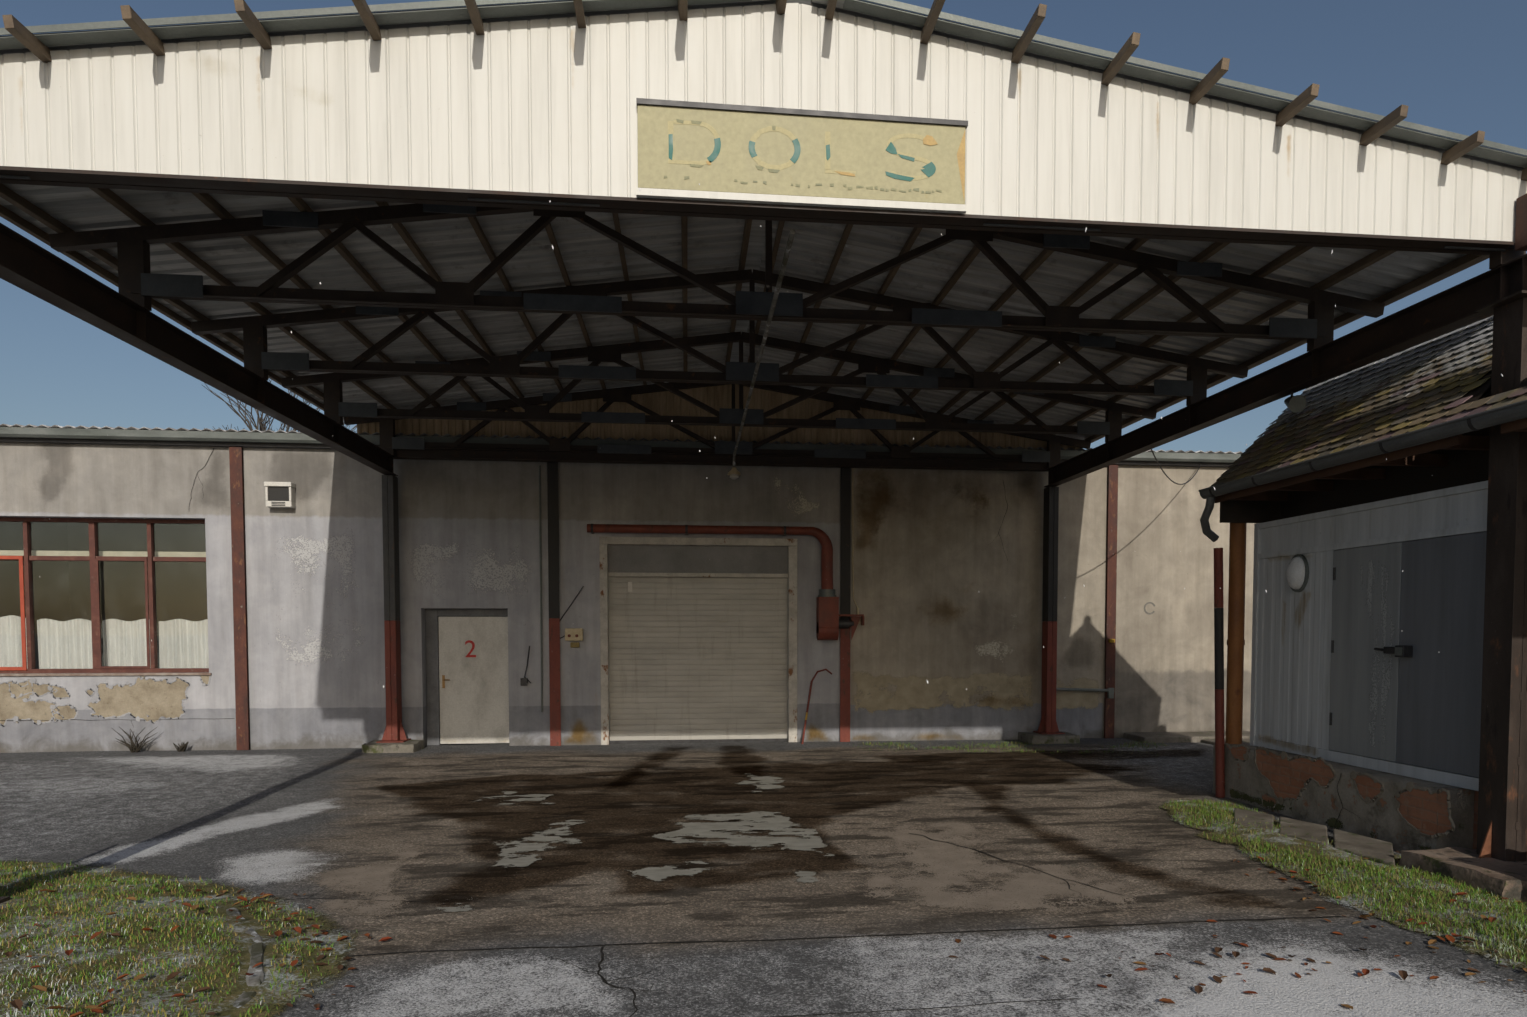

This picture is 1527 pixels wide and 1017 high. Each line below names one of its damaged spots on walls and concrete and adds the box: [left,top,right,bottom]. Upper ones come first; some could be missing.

flaking render [0,675,212,727]
flaking render [852,671,1034,714]
flaking render [1254,746,1337,809]
crack [341,833,1339,1017]